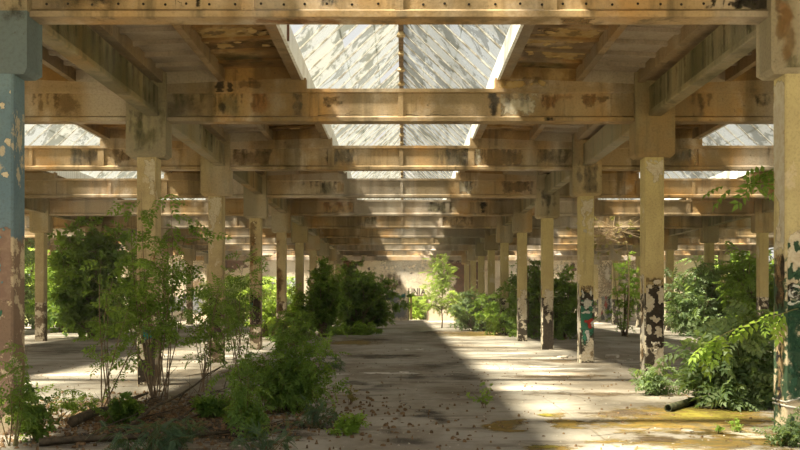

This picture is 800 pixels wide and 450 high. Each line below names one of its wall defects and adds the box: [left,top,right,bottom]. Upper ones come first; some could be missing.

water stain [215,81,233,92]
water stain [488,80,546,116]
peeling [519,289,527,320]
peeling [541,286,553,350]
peeling [555,260,663,379]